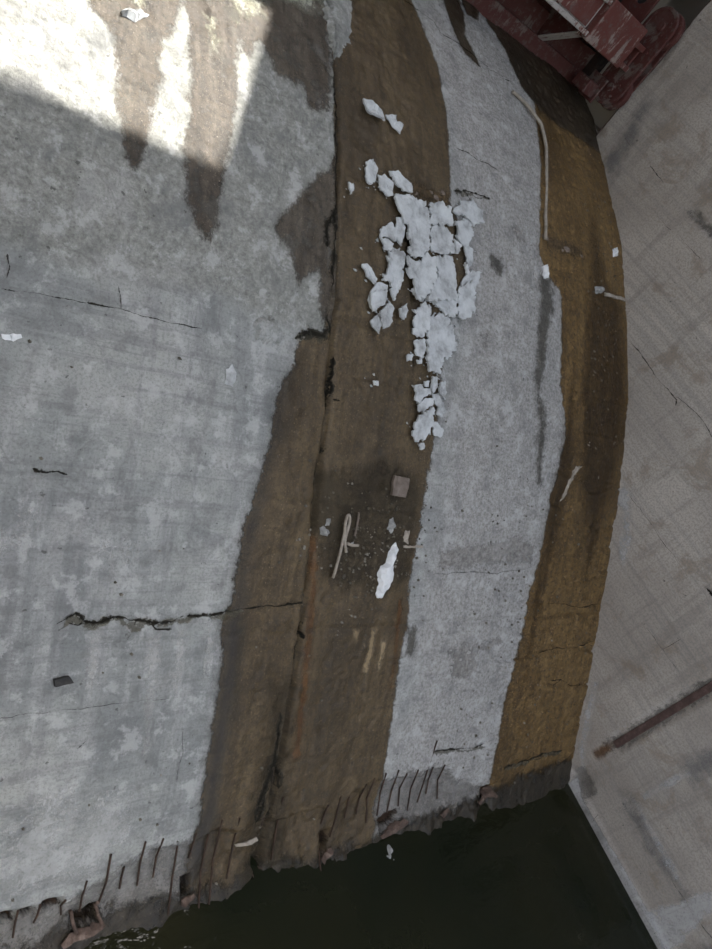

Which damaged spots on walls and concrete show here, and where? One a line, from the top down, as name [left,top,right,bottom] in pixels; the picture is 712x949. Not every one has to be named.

peeling [362,98,404,134]
leakage [444,0,645,167]
crack [0,254,197,328]
crack [295,75,340,454]
peeling [353,159,485,450]
leakage [535,275,555,485]
crack [32,467,67,475]
leakage [5,0,466,949]
crack [57,601,305,680]
spalling [0,833,197,949]
spalling [318,740,482,871]
leakage [395,749,712,949]